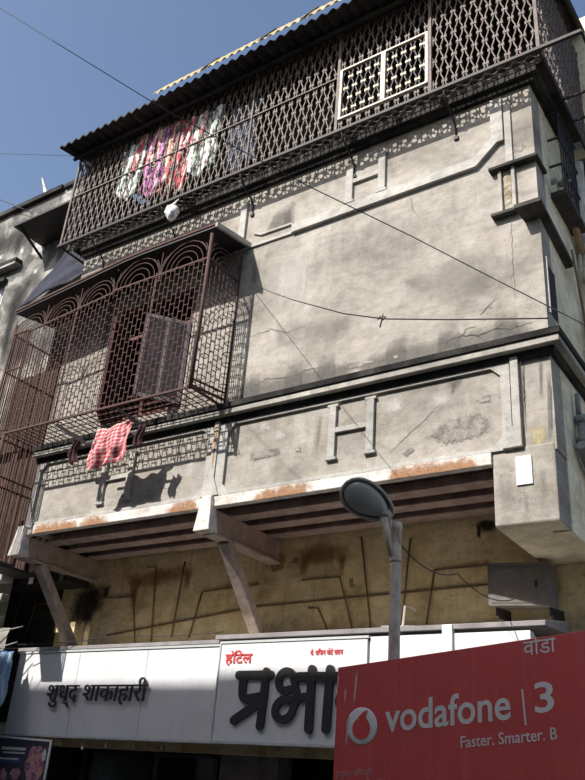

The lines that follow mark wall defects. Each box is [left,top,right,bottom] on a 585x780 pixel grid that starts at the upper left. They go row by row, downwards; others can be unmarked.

crack [445,299,531,343]
flaking render [430,395,490,445]
corrosion [391,460,475,479]
corrosion [254,485,304,500]
corrosion [35,518,106,533]